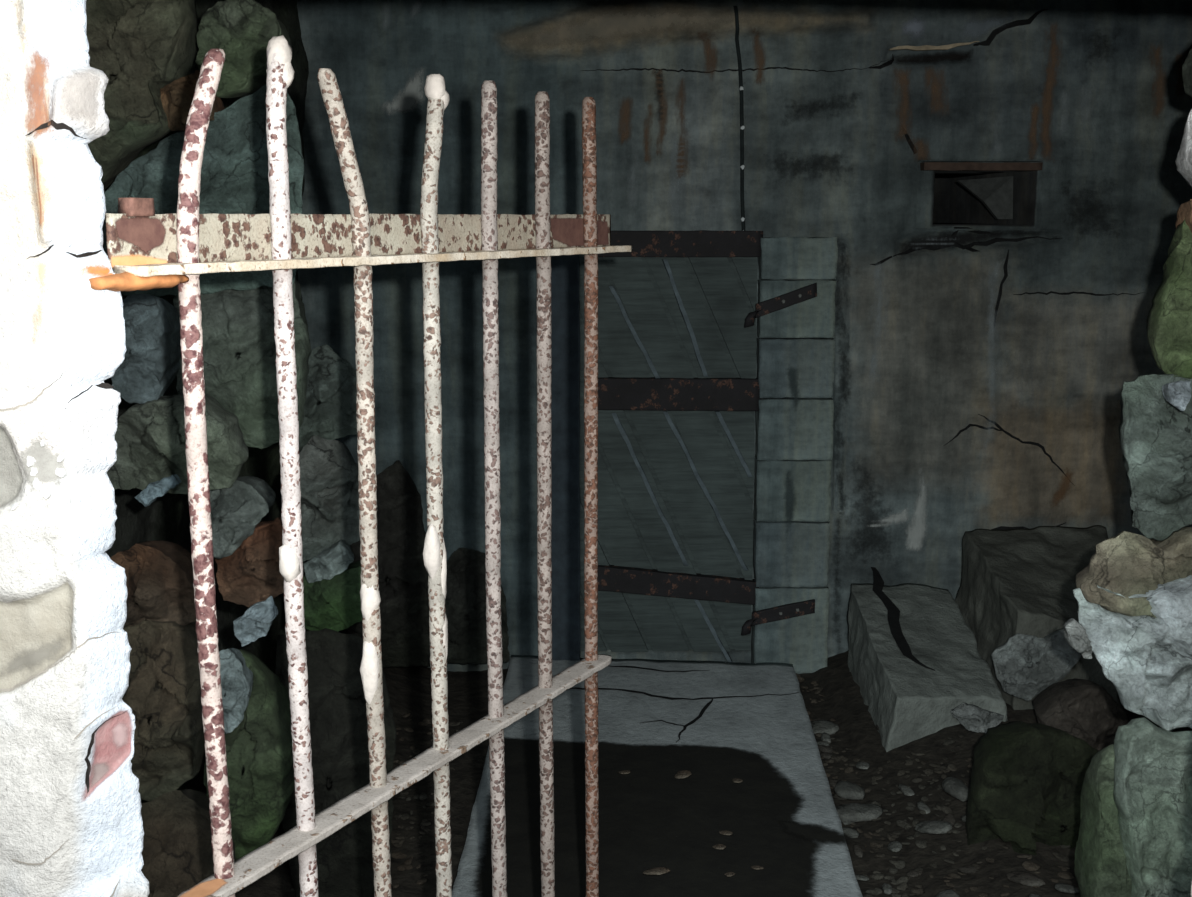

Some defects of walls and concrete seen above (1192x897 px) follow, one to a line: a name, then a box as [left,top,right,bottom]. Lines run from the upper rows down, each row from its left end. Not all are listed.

crack [973,9,1048,46]
crack [25,120,86,139]
spalling [0,426,67,510]
crack [945,414,1075,486]
crack [569,665,799,742]
spalling [84,711,132,799]